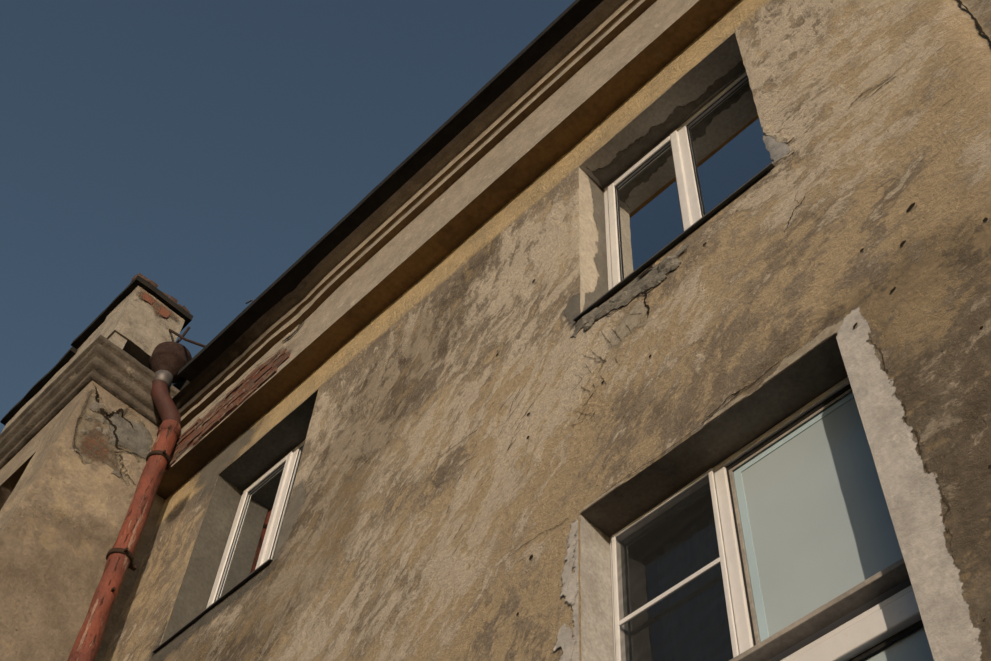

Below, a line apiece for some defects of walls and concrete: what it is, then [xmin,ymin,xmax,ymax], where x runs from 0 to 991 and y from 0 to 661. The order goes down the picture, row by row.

crack [958,0,991,44]
spalling [570,245,689,349]
spalling [73,383,153,486]
flaking render [165,342,293,471]
peeling [502,319,858,661]